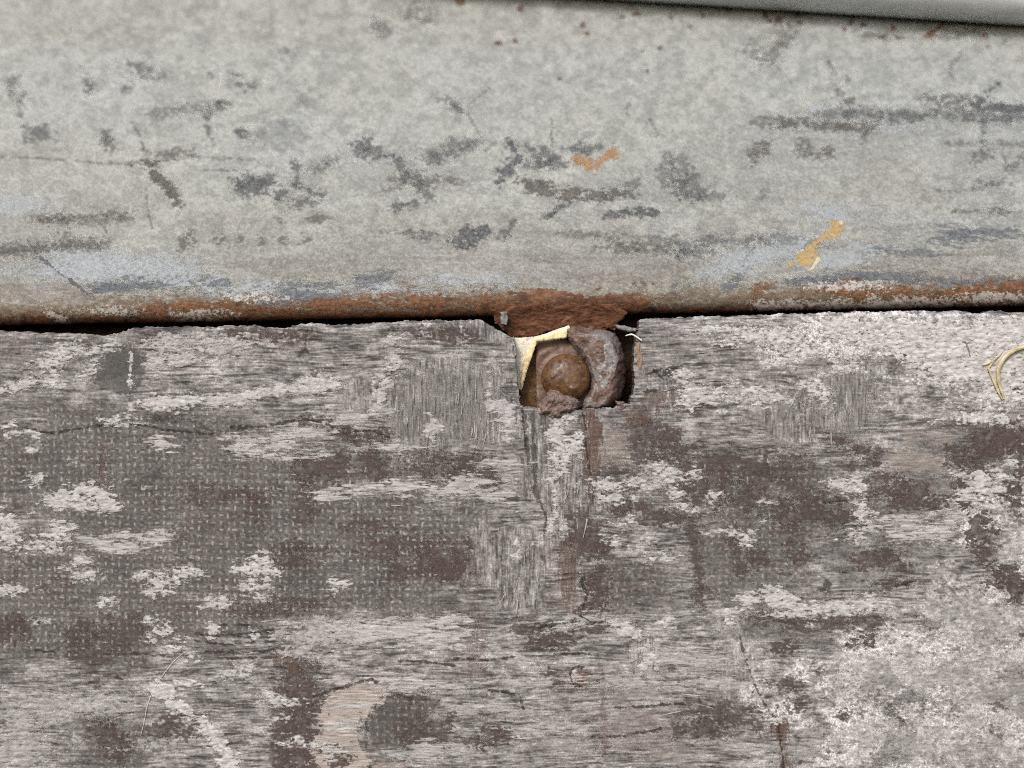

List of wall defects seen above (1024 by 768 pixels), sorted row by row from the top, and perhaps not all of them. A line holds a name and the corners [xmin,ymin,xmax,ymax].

corrosion [571,147,619,172]
corrosion [0,276,1024,325]
corrosion [598,341,619,389]